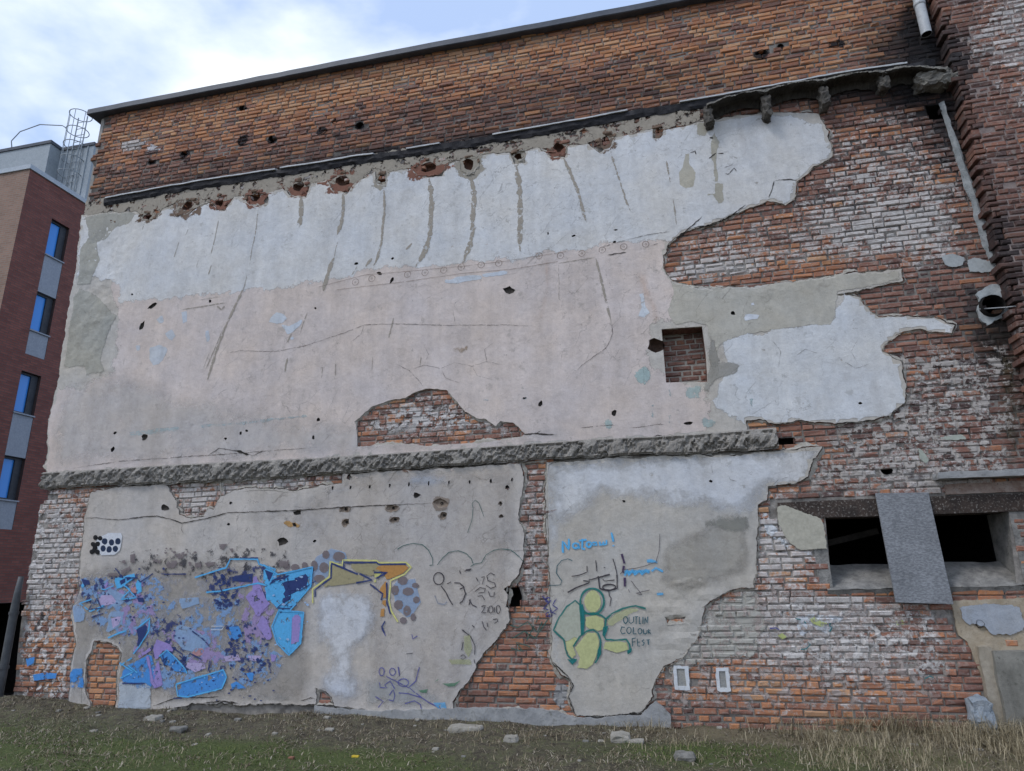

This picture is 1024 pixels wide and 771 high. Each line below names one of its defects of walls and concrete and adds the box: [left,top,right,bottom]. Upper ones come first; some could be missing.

damp [372,172,390,261]
damp [407,154,485,267]
damp [511,152,526,251]
damp [547,138,586,221]
damp [597,137,630,210]
peeling [43,89,744,472]
flaking render [628,87,1024,732]
flaking render [13,455,657,717]